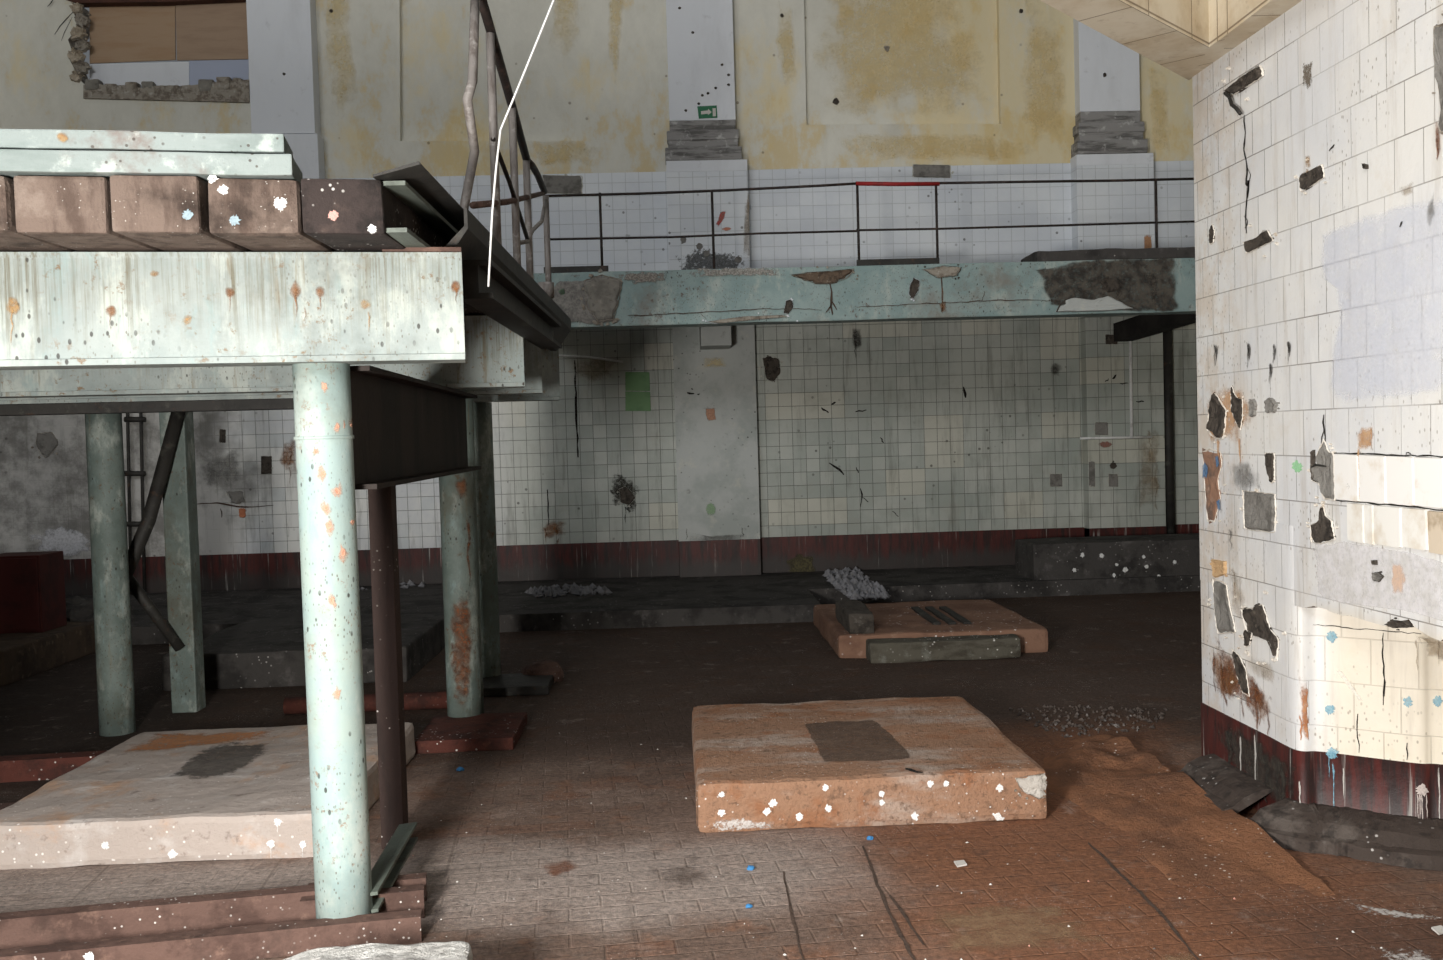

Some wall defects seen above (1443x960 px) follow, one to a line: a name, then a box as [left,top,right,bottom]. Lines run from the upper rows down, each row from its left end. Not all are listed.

crack [1243,115,1251,233]
spalling [679,238,858,284]
rust [8,298,19,334]
spalling [552,269,665,326]
peeling [1051,295,1135,312]
peeling [1201,385,1280,533]
peeling [1306,439,1338,544]
spalling [1371,560,1384,582]
rust [451,602,471,697]
peeling [1207,559,1287,699]
spalling [1384,617,1414,631]
rust [1299,688,1309,740]